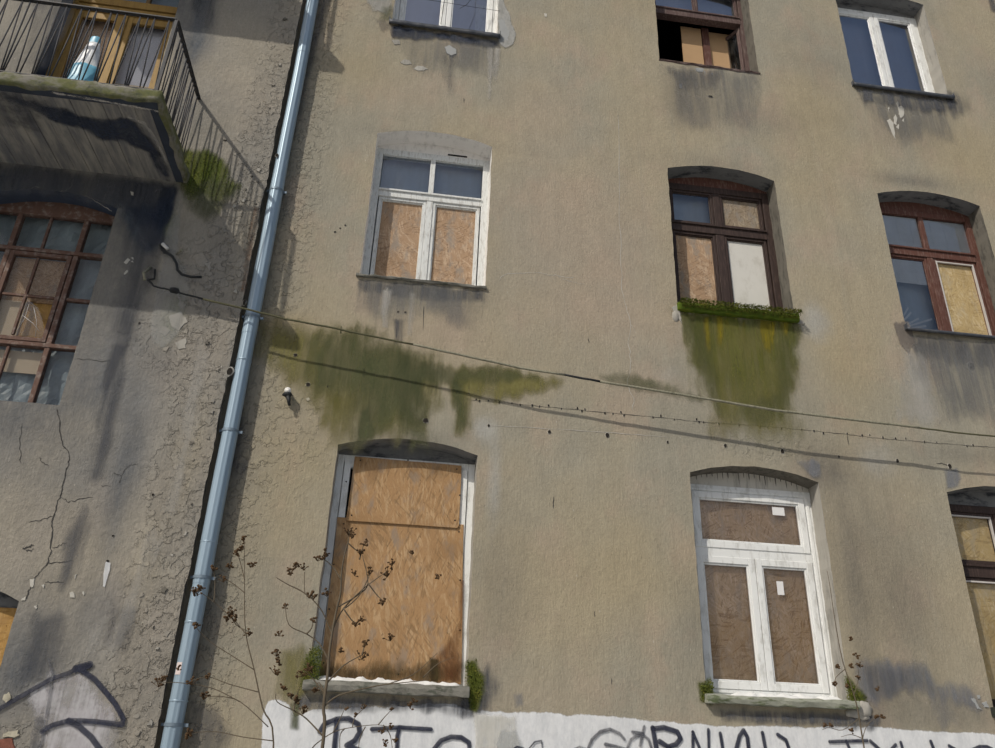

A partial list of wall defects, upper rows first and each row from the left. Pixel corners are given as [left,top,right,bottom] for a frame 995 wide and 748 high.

flaking render [887,102,904,138]
leakage [315,336,434,439]
leakage [894,322,995,409]
crack [19,410,135,598]